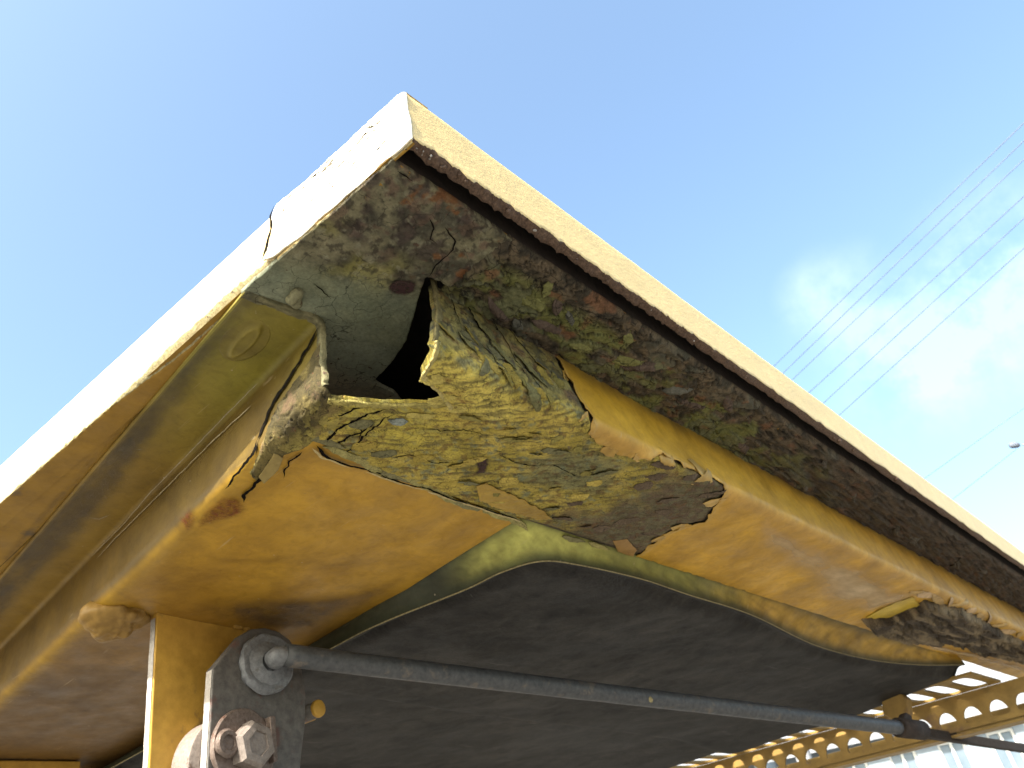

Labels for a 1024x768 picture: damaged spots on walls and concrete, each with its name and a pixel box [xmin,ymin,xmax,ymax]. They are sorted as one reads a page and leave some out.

crack [261,207,274,261]
crack [429,218,456,275]
crack [226,328,318,502]
peeling [312,445,553,522]
peeling [659,453,712,485]
peeling [613,539,637,556]
leakage [775,539,897,608]
peeling [866,590,1024,638]